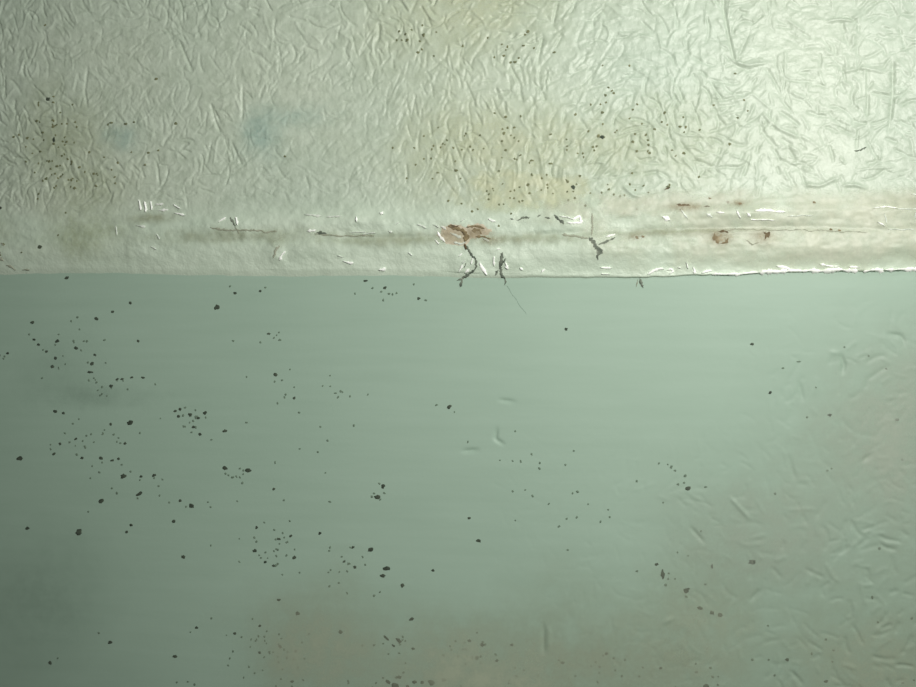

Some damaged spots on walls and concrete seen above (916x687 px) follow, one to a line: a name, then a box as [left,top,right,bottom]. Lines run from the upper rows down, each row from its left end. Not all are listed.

damp [12,96,98,190]
damp [566,87,618,158]
damp [447,112,916,265]
rust [448,224,490,249]
crack [489,214,616,275]
crack [457,246,526,313]
damp [87,354,145,397]
mould [50,418,127,459]
damp [174,407,213,440]
mould [90,457,194,508]
mould [252,522,296,575]
damp [361,635,435,687]